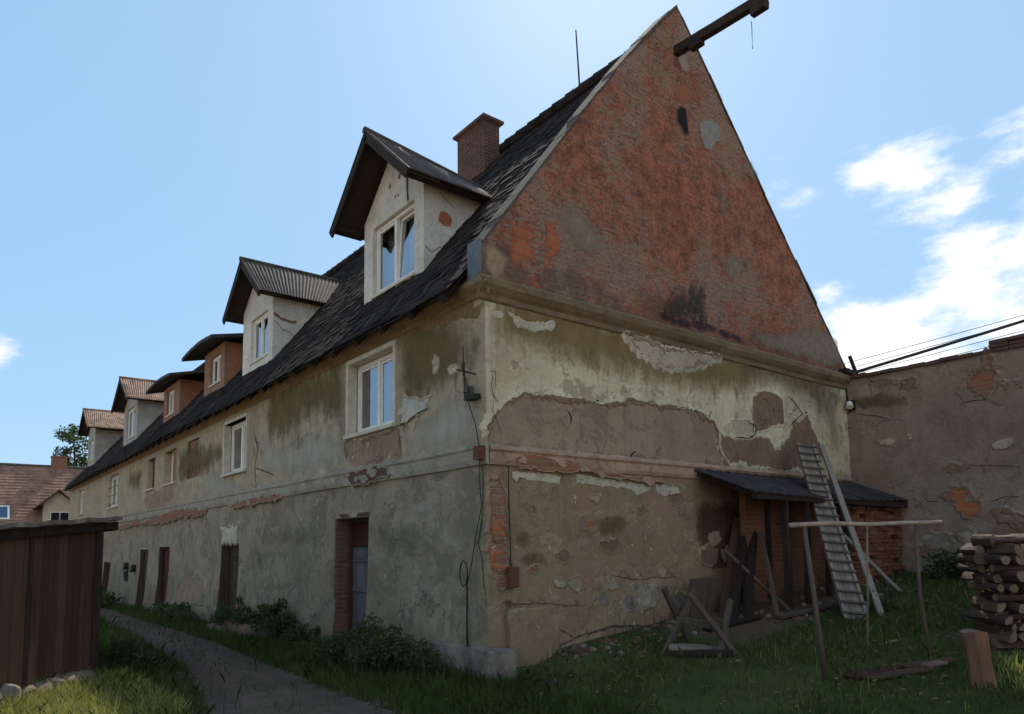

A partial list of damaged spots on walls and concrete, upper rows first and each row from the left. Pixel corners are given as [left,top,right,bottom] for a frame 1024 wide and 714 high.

flaking render [419,301,555,333]
water stain [661,284,745,343]
water stain [504,305,833,421]
flaking render [621,330,722,374]
flaking render [966,347,1001,399]
flaking render [343,393,433,488]
flaking render [118,484,208,530]
flaking render [218,493,283,546]
flaking render [479,385,824,597]
flaking render [914,460,1024,554]
crack [475,474,677,646]